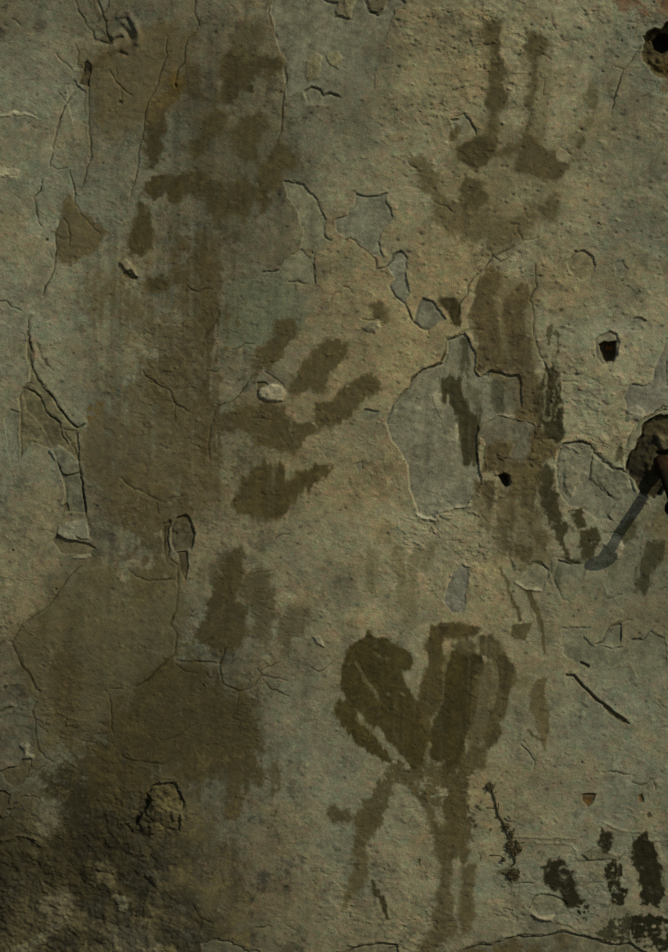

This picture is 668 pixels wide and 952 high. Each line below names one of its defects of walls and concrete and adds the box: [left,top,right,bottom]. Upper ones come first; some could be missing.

crack [611,47,660,116]
flaking render [17,334,96,560]
damp [2,16,315,839]
flaking render [555,338,668,522]
crack [343,942,397,952]
crack [456,923,644,952]